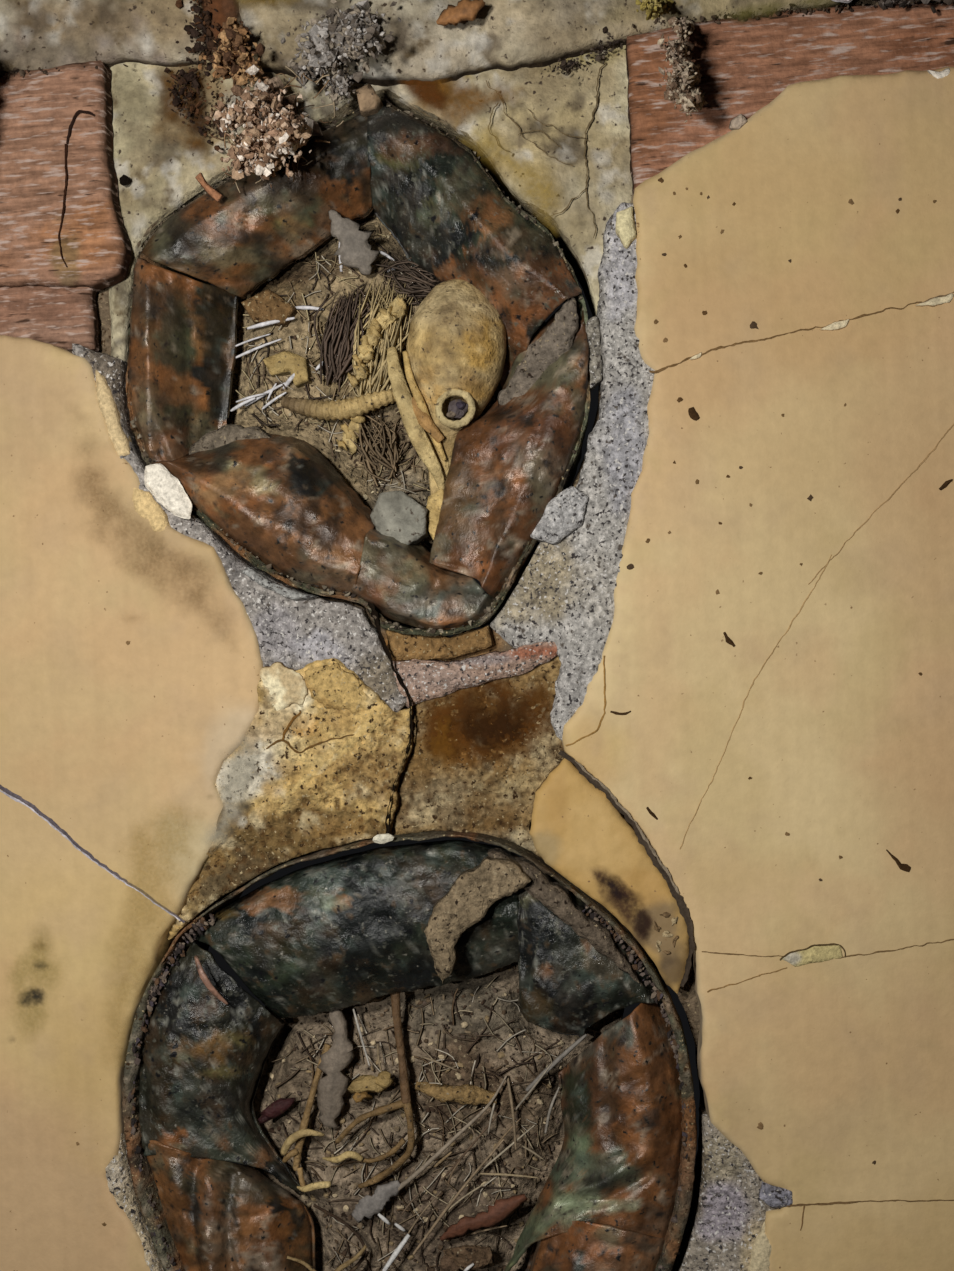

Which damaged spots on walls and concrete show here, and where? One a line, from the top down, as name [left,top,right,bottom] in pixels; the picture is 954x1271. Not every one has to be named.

crack [649,292,954,373]
crack [558,424,954,993]
crack [0,785,185,923]